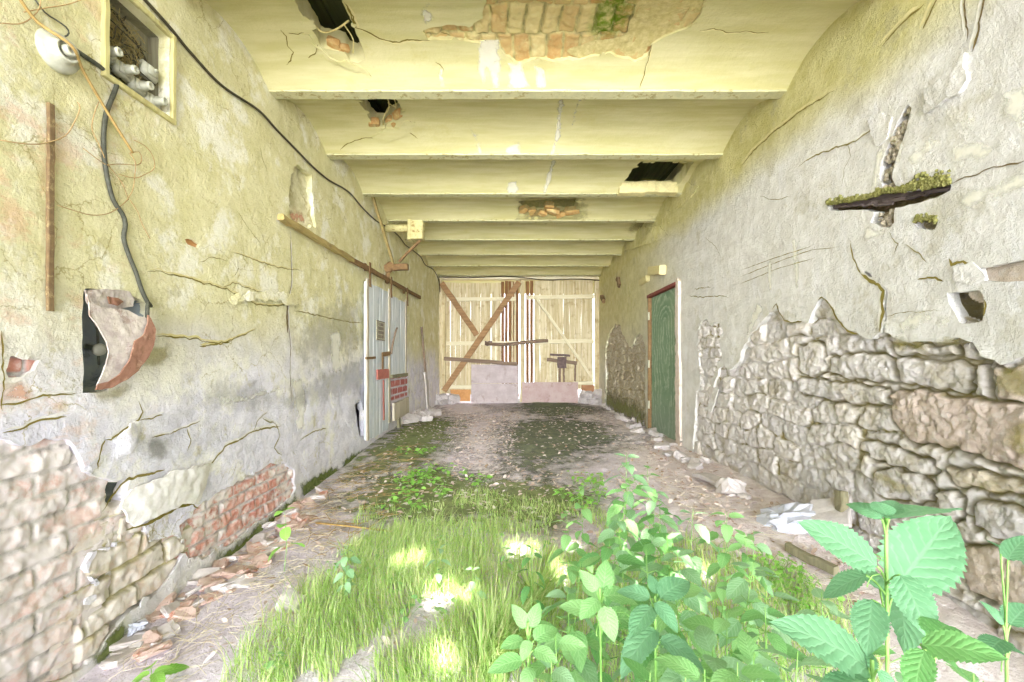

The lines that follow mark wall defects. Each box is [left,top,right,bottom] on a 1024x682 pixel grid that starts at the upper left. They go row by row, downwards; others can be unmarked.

spalling [424,0,705,63]
crack [877,0,985,52]
spalling [519,198,583,220]
crack [148,215,360,400]
crack [818,240,937,334]
spalling [6,352,35,377]
spalling [604,321,647,426]
crack [97,399,326,467]
crack [104,470,164,509]
crack [127,503,200,530]
spalling [694,299,1024,653]
spalling [0,439,294,682]